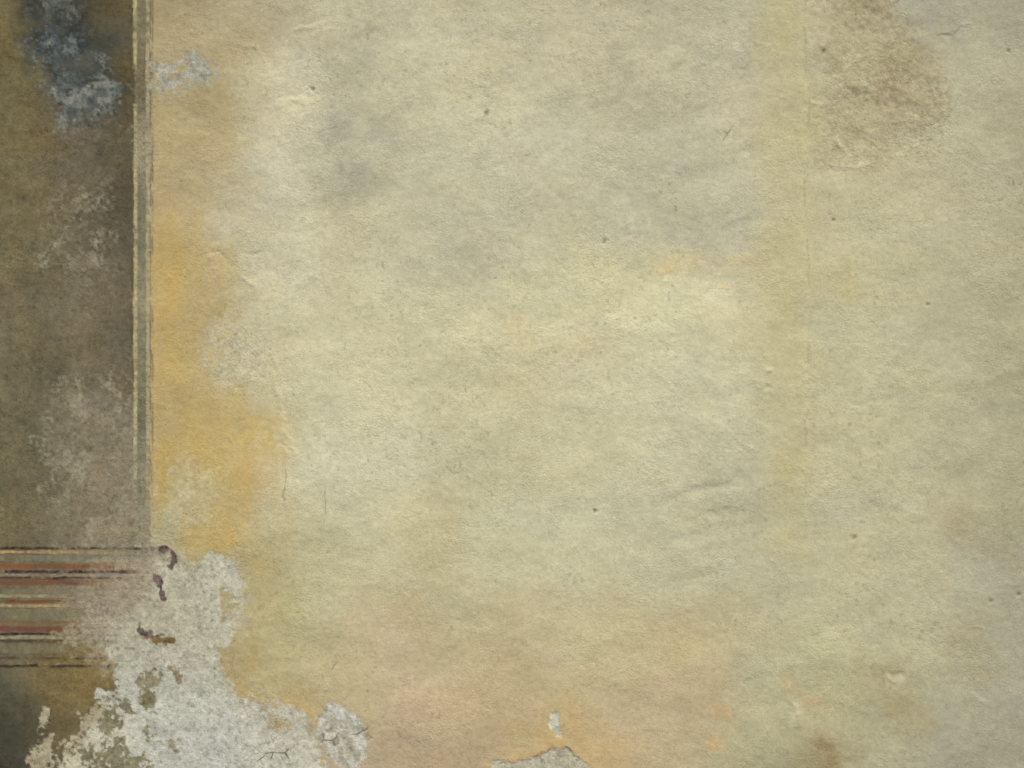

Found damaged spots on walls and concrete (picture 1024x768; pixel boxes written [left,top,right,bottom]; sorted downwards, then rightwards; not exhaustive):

leakage [3,0,248,157]
peeling [24,444,336,768]
spalling [489,711,591,768]